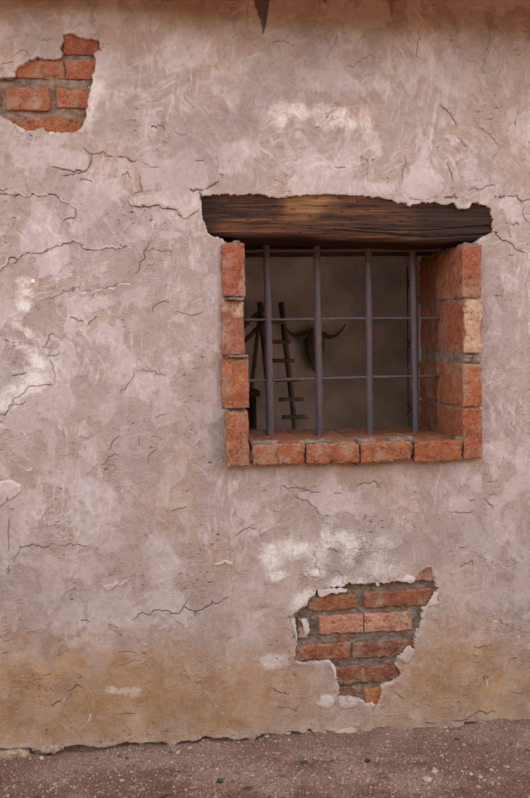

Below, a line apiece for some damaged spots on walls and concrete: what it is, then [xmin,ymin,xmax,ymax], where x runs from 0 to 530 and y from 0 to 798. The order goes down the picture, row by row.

flaking render [0,34,100,136]
crack [0,188,79,222]
crack [50,149,218,219]
crack [444,163,530,256]
crack [0,238,174,299]
crack [2,333,59,415]
peeling [0,480,21,506]
damp [0,604,340,749]
crack [134,597,228,619]
flaking render [292,567,440,705]